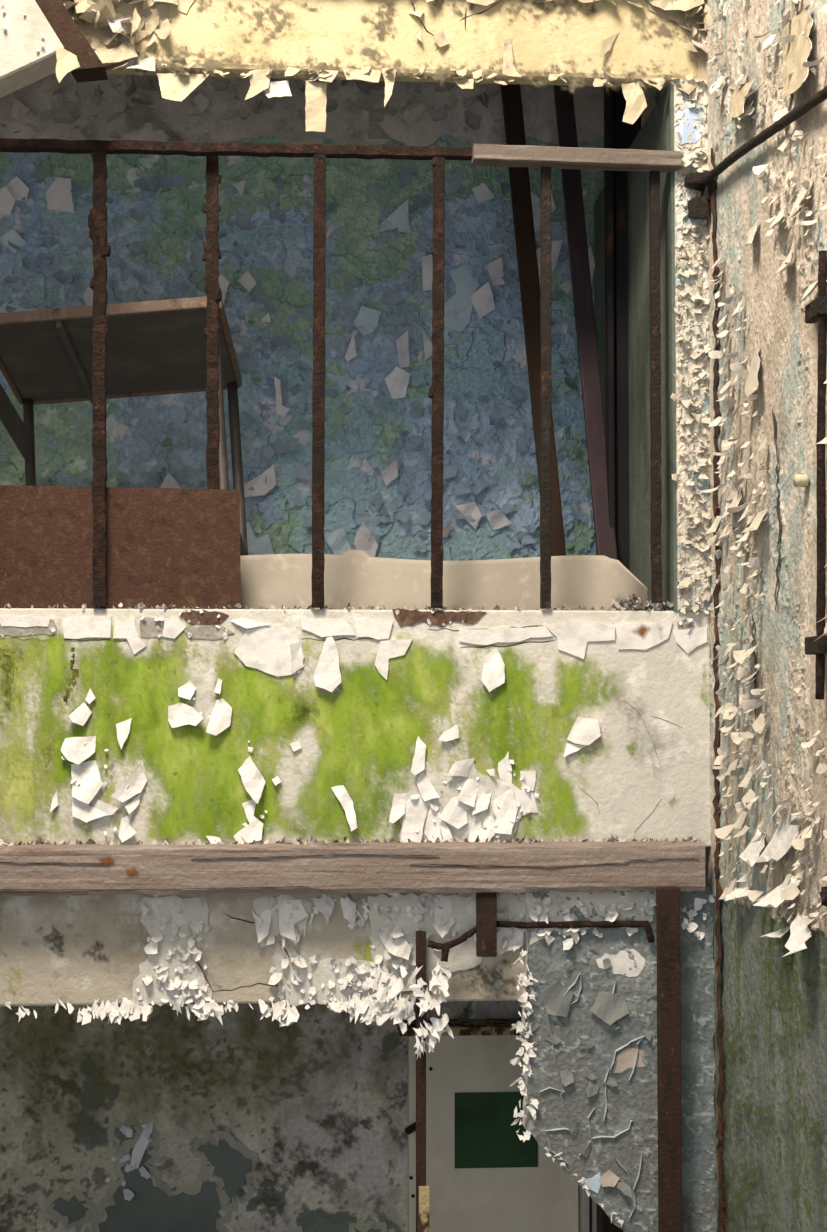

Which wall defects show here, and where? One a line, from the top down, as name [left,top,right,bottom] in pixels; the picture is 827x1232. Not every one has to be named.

peeling [0,0,827,172]
peeling [0,157,84,272]
peeling [371,167,432,235]
peeling [745,130,827,274]
peeling [0,178,827,957]
peeling [5,1002,37,1023]
water stain [6,1005,236,1121]
peeling [55,892,483,1058]
water stain [240,1003,307,1075]
peeling [497,891,656,1142]
water stain [255,1115,372,1225]
peeling [544,1147,632,1226]